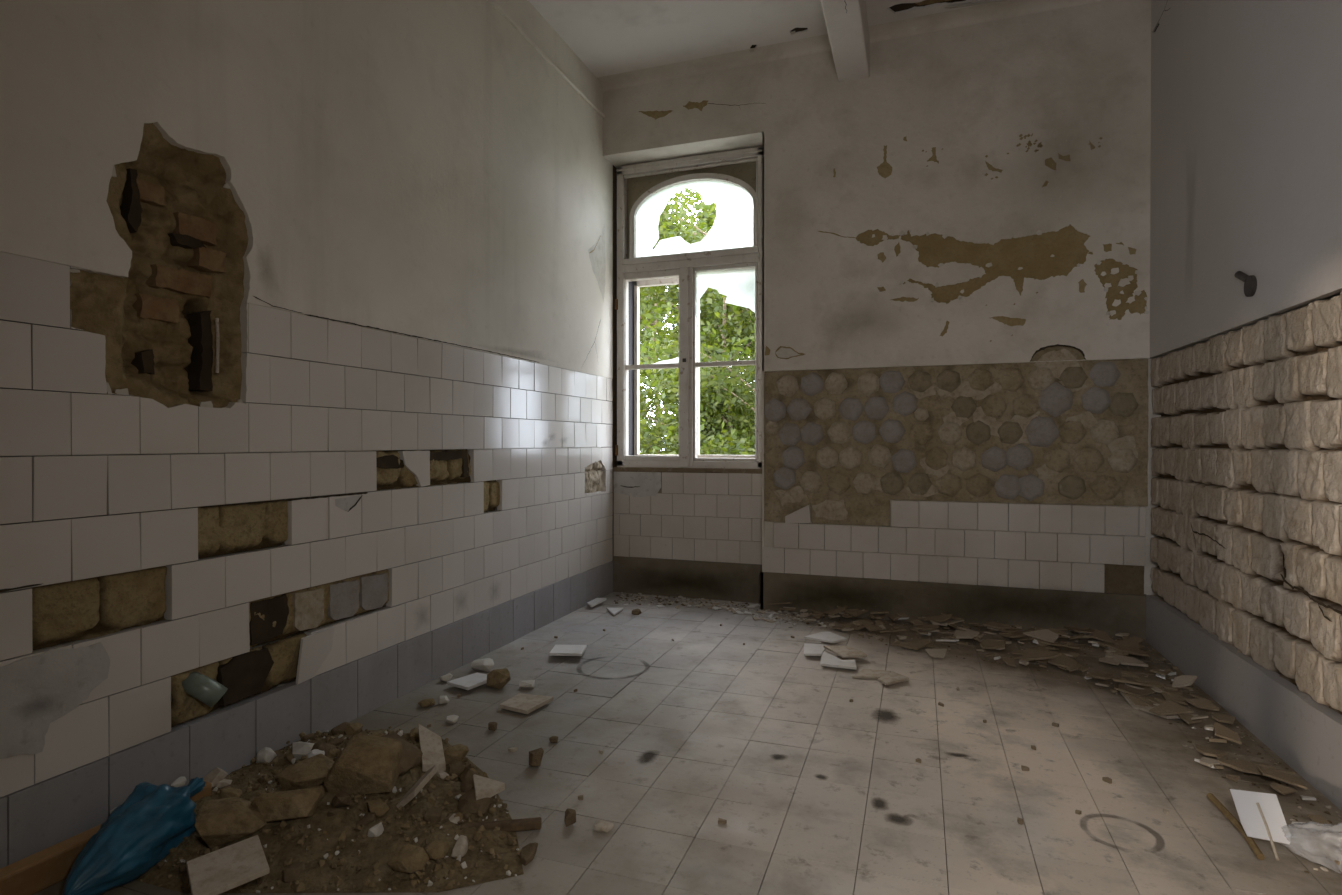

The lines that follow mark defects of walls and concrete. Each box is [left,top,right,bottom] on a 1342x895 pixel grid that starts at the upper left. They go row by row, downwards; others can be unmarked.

peeling [638,100,708,120]
peeling [877,145,892,178]
peeling [1007,133,1071,187]
flaking render [70,123,249,408]
peeling [818,225,1149,336]
peeling [198,499,288,559]
peeling [376,449,500,513]
spalling [581,461,605,493]
peeling [764,291,1342,715]
peeling [32,566,167,650]
peeling [170,569,389,728]